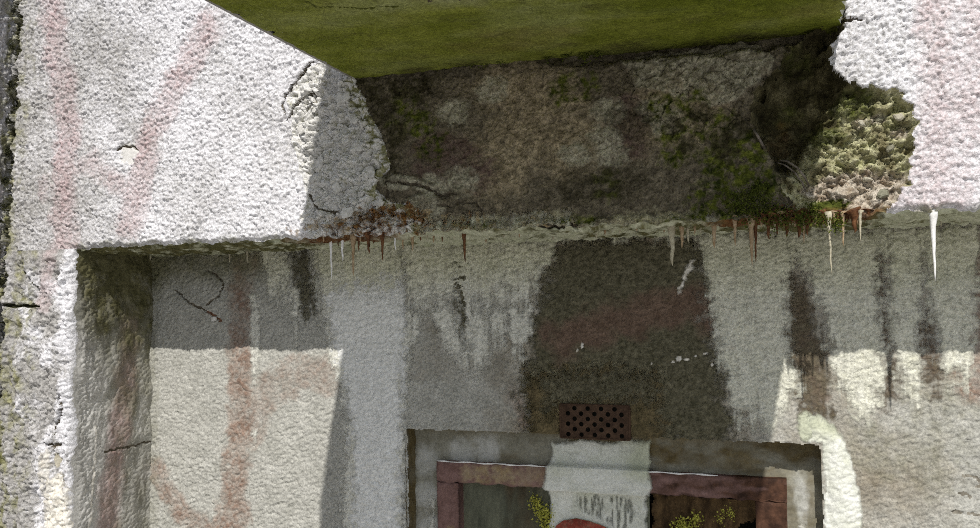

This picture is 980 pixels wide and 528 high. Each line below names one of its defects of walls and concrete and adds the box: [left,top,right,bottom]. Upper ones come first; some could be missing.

crack [281,61,318,120]
spalling [286,12,920,239]
crack [0,0,40,367]
rust [305,201,471,235]
crack [175,270,224,311]
water stain [249,217,980,528]
crack [104,440,151,453]